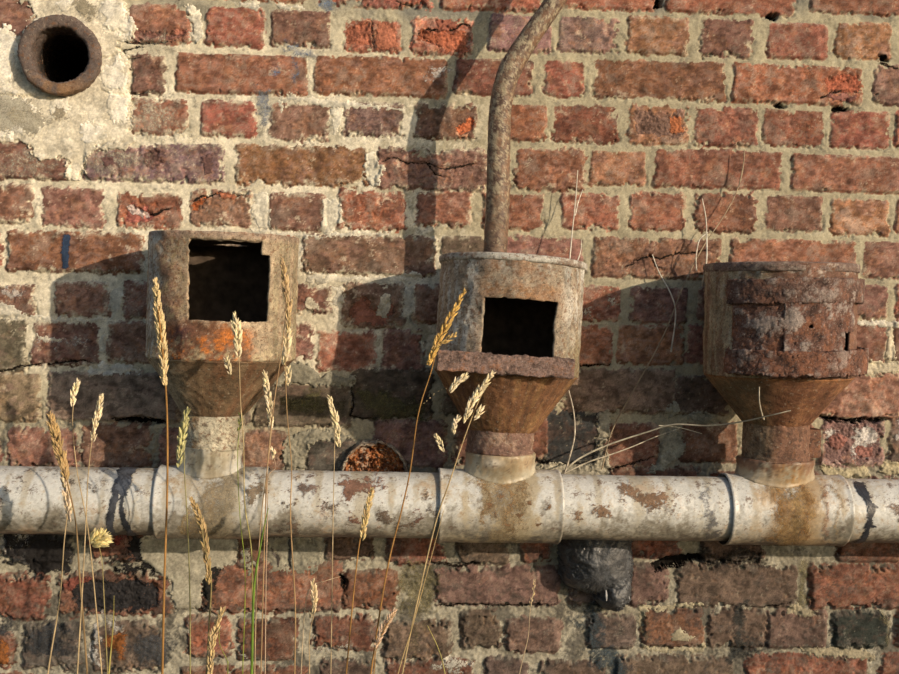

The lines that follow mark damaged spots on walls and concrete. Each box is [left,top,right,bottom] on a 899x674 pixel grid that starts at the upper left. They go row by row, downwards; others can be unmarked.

spalling [417,19,468,55]
peeling [0,0,189,181]
crack [382,157,474,177]
crack [194,191,246,202]
damp [851,420,899,465]